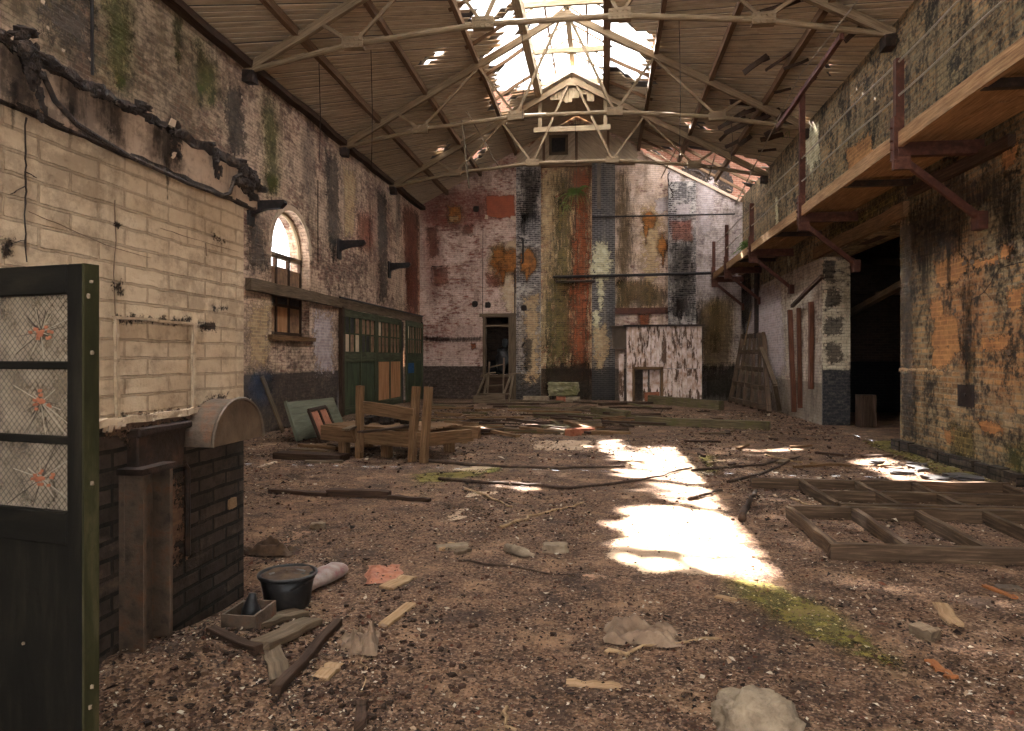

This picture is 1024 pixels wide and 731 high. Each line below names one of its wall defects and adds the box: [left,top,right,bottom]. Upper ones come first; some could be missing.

spalling [486,273,501,288]
leakage [486,169,541,313]
peeling [520,167,568,383]
leakage [544,240,625,399]
leakage [639,205,698,324]
leakage [898,167,1024,438]
spalling [927,240,1014,372]